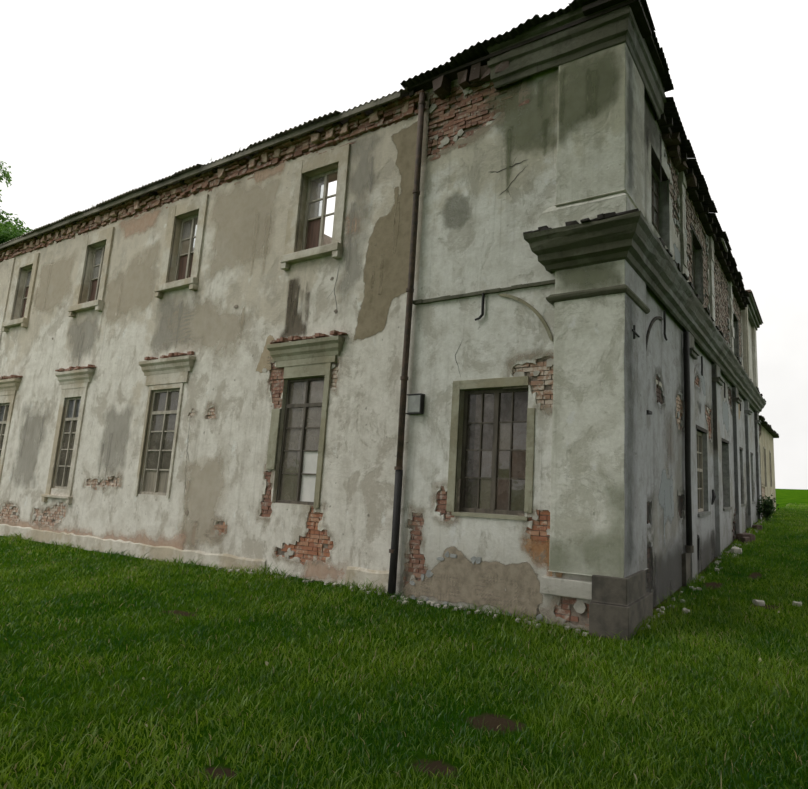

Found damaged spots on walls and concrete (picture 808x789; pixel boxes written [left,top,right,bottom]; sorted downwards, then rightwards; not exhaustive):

flaking render [416,62,530,163]
flaking render [17,122,360,252]
water stain [446,195,466,227]
flaking render [661,132,710,310]
flaking render [503,353,554,414]
flaking render [654,370,665,408]
flaking render [0,502,20,523]
flaking render [30,502,67,528]
flaking render [261,464,278,520]
flaking render [274,505,333,565]
flaking render [433,479,460,524]
flaking render [402,507,589,631]